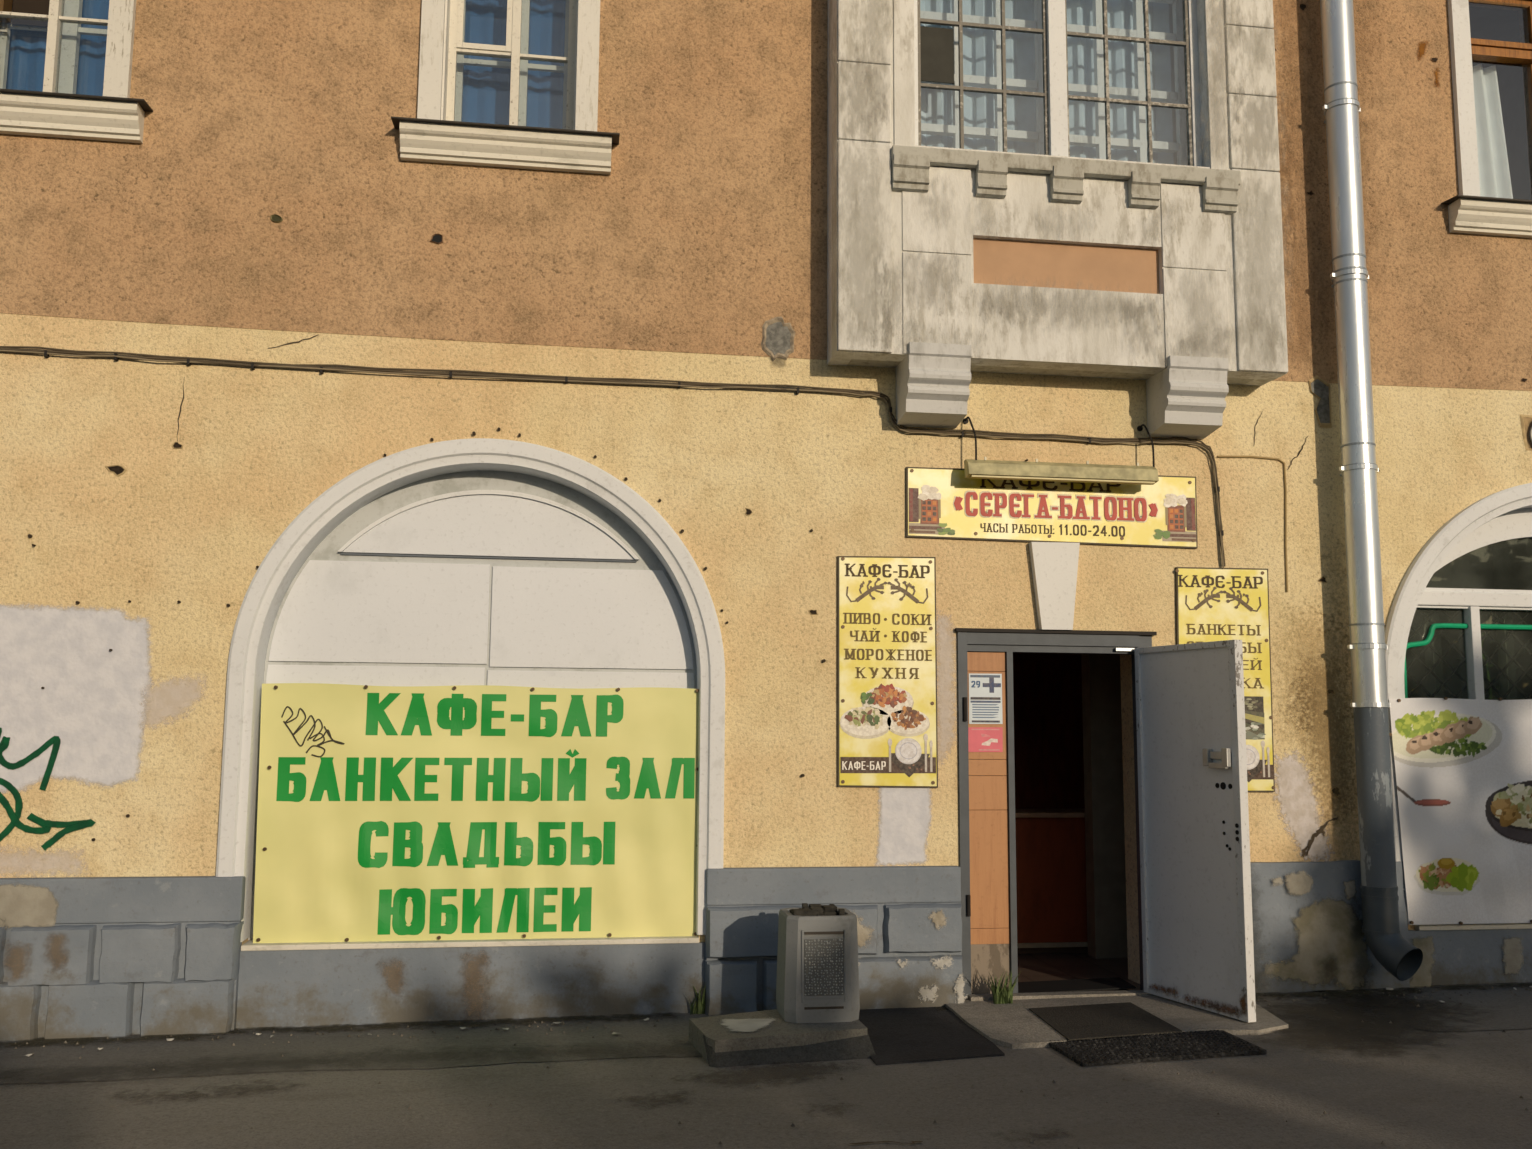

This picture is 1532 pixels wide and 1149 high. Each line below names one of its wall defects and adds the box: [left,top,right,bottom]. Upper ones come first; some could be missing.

crack [177,377,185,441]
flaking render [1309,375,1332,428]
peeling [1265,751,1372,991]
peeling [856,915,874,966]
peeling [918,956,968,1004]